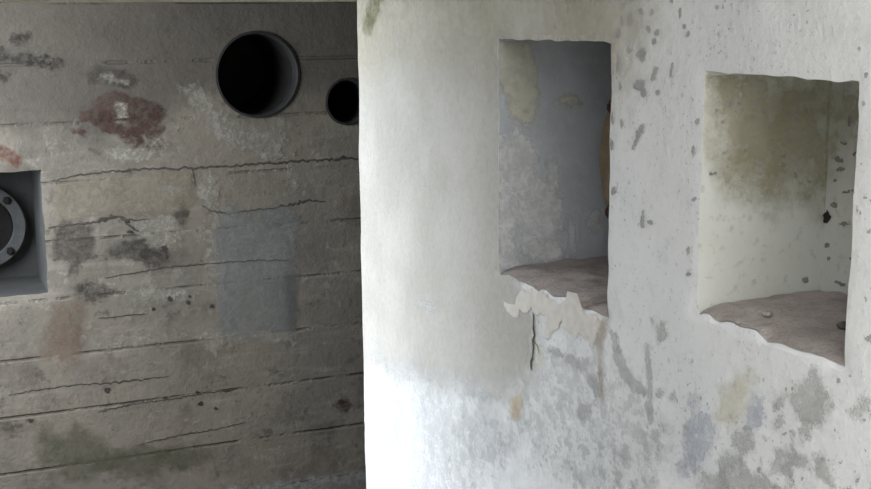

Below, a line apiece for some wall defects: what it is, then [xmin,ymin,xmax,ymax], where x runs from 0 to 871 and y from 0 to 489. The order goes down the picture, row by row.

leakage [707,75,859,187]
peeling [228,0,841,489]
spalling [823,202,850,227]